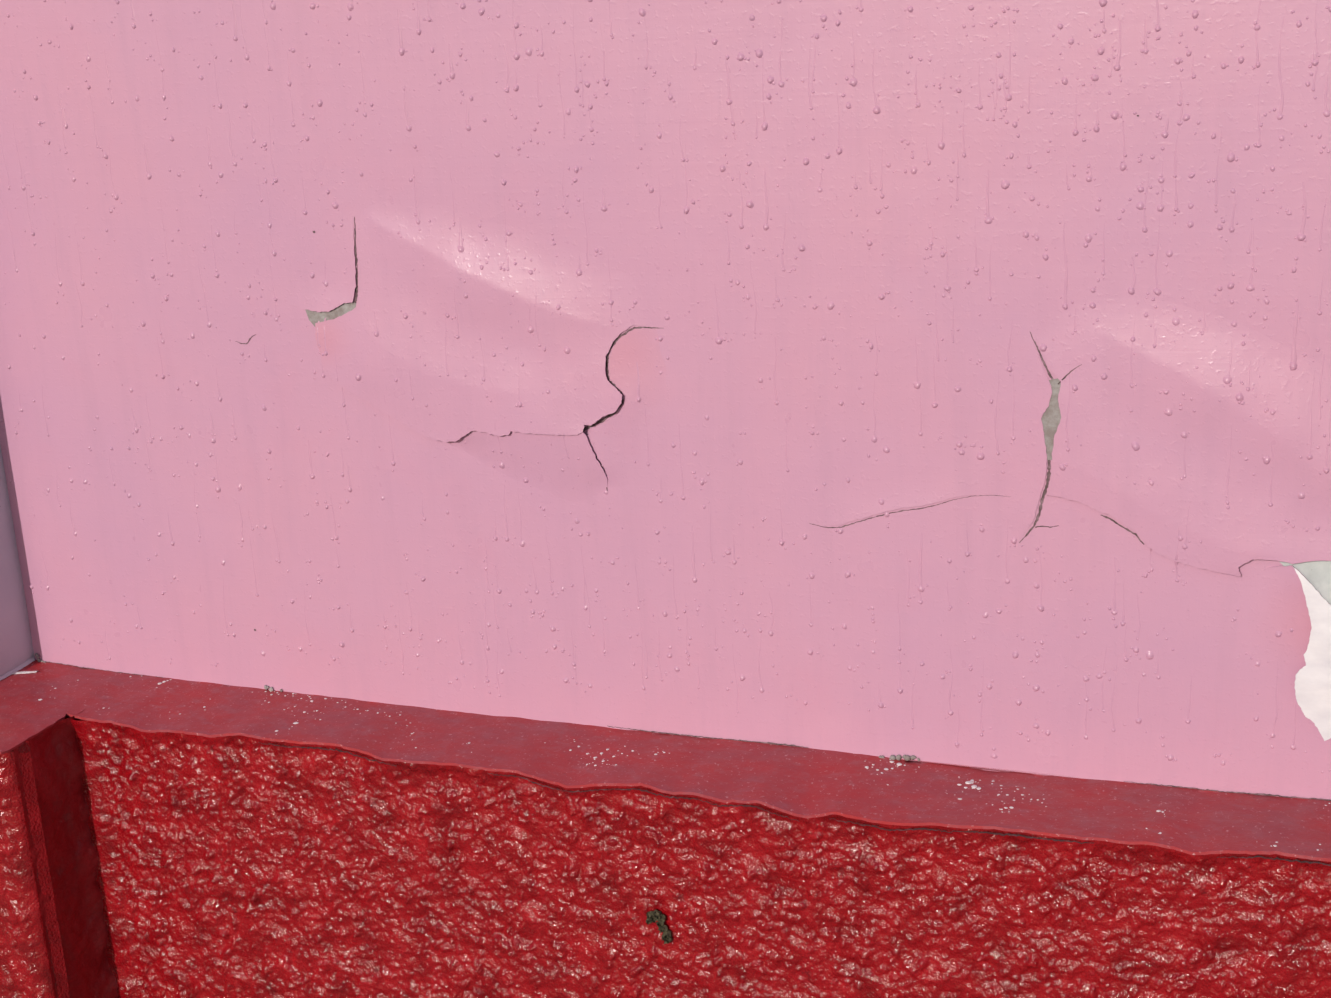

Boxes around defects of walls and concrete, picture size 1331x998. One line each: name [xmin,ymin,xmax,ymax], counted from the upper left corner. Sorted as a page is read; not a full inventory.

crack [993,332,1082,543]
peeling [1036,296,1331,741]